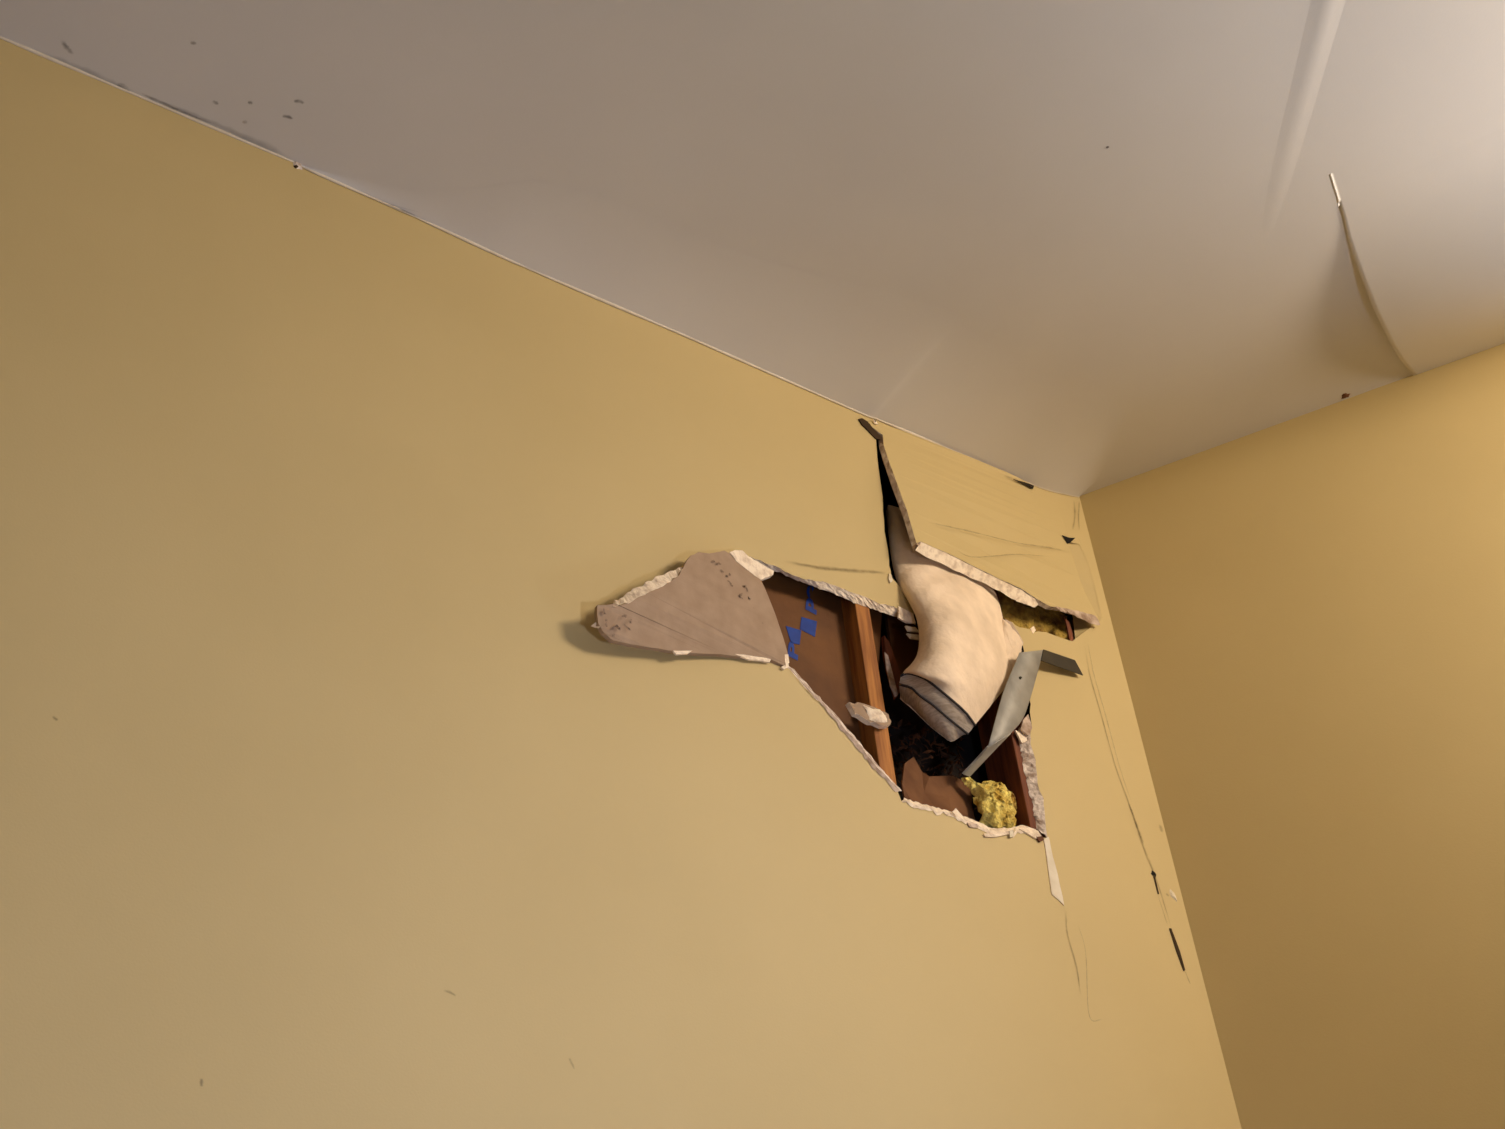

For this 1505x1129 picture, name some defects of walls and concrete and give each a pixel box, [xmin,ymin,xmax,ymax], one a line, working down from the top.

peeling [729,550,774,581]
peeling [897,606,919,640]
peeling [736,654,789,670]
crack [1169,928,1185,971]